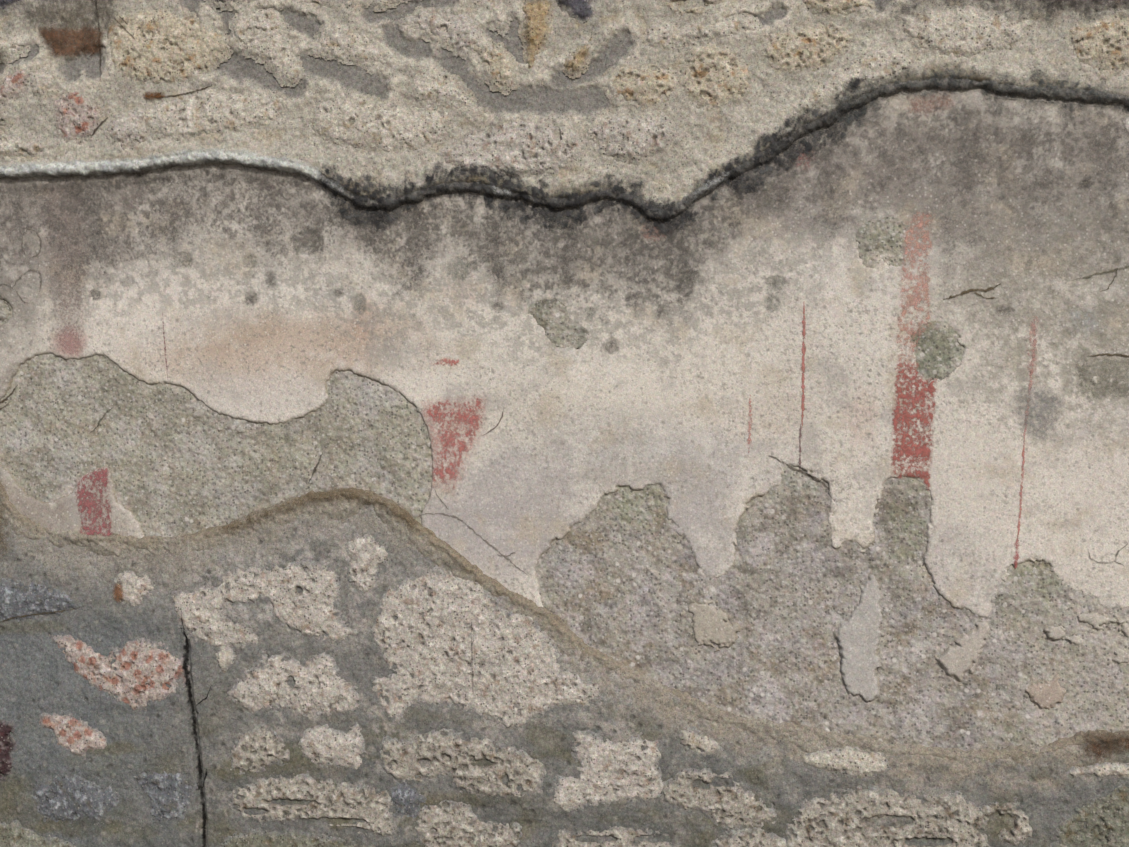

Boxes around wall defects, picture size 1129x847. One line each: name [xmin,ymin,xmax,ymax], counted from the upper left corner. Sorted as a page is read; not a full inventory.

water stain [0,68,1129,314]
spalling [0,353,433,537]
spalling [910,320,965,383]
peeling [1075,358,1129,398]
spalling [535,465,1129,751]
crack [181,611,212,847]